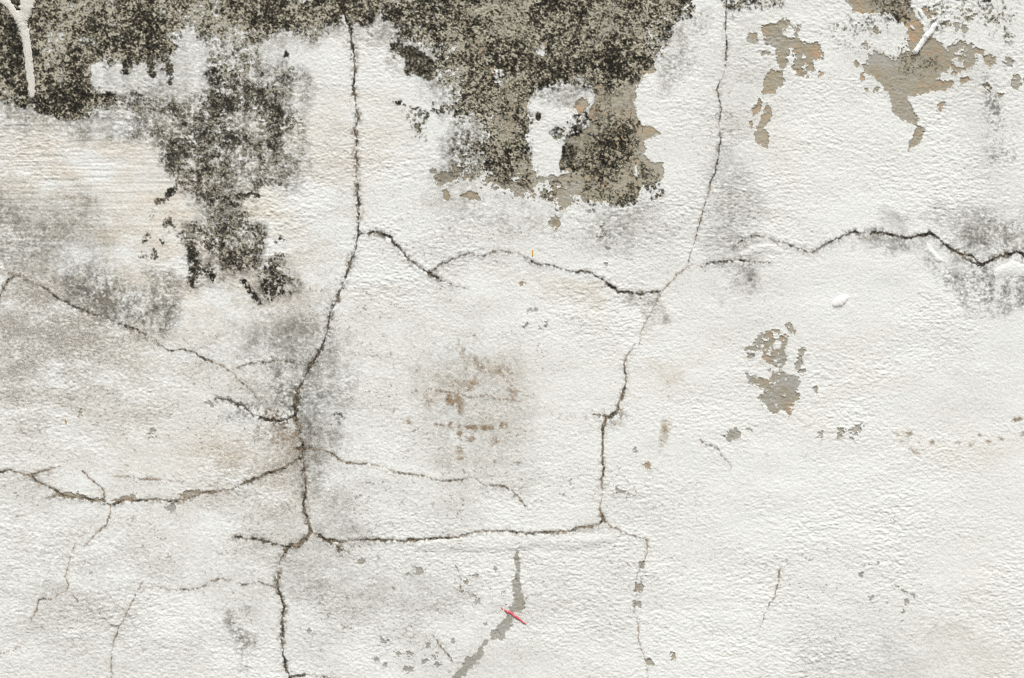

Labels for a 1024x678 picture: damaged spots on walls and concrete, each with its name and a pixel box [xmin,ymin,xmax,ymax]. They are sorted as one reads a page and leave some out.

water stain [0,0,701,332]
peeling [430,0,693,230]
peeling [747,18,824,149]
peeling [845,0,1024,152]
crack [734,230,1024,266]
crack [0,0,770,678]
peeling [744,322,806,415]
peeling [453,550,525,678]